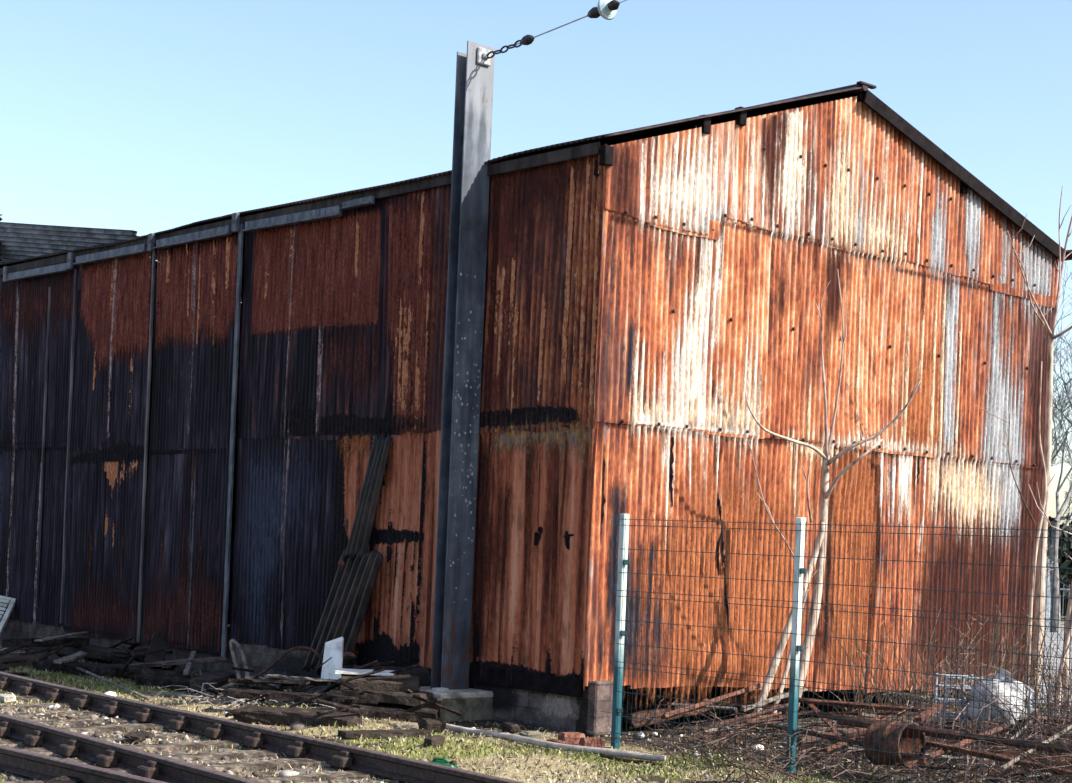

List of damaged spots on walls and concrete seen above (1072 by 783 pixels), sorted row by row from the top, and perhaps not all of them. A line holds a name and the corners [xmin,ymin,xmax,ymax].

corrosion [107,258,117,437]
corrosion [470,436,511,663]
corrosion [522,443,540,636]
corrosion [482,157,593,425]
corrosion [550,441,567,625]
corrosion [599,113,1051,703]
damp [880,449,926,538]